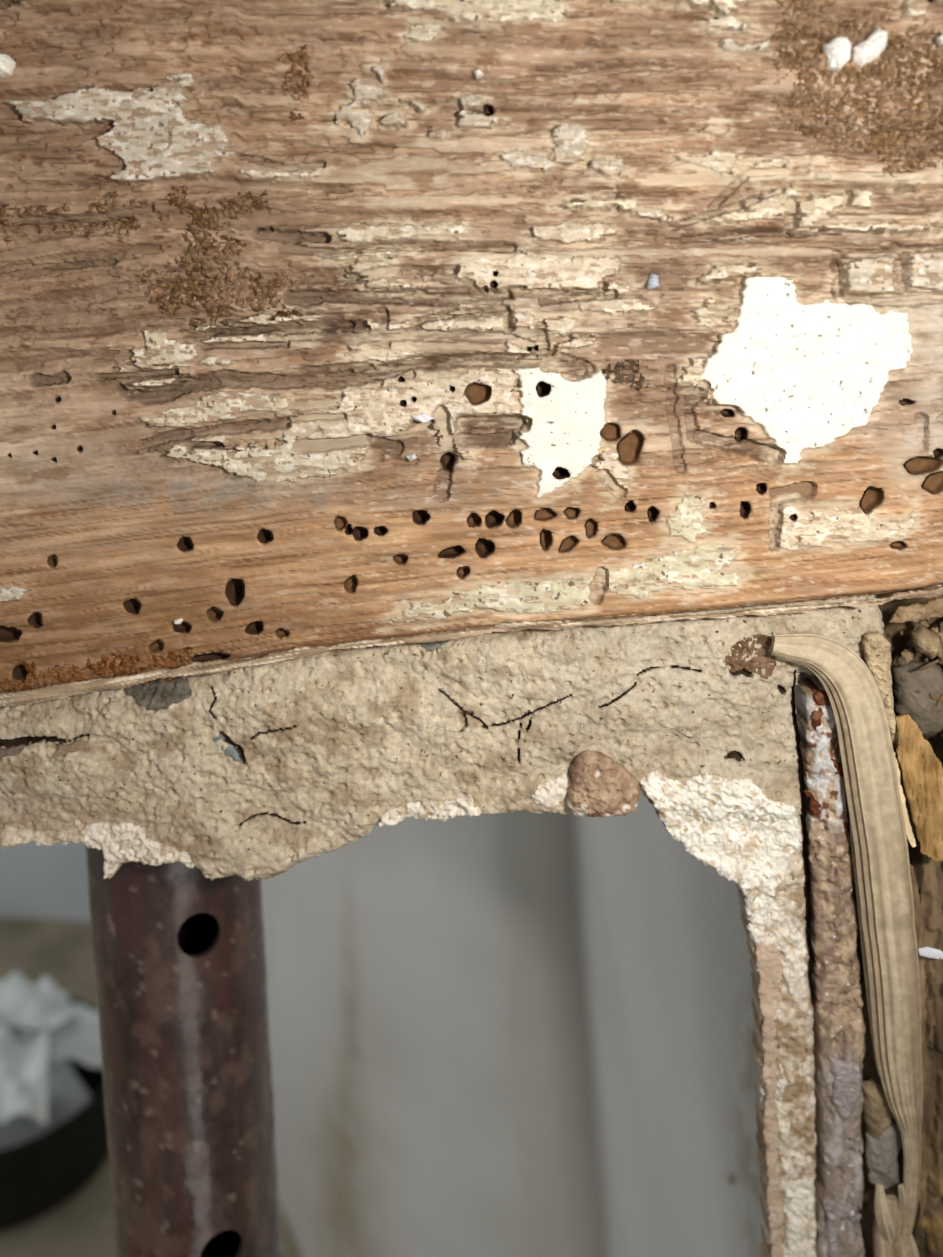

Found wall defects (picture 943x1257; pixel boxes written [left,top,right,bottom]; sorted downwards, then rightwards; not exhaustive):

peeling [8,74,238,181]
peeling [367,199,673,351]
peeling [120,313,320,386]
peeling [682,252,943,463]
peeling [139,343,630,498]
crack [0,733,90,748]
crack [209,685,296,765]
crack [439,688,572,759]
crack [600,665,816,1007]
rust [803,789,821,815]
rust [811,691,830,730]
rust [830,758,844,778]